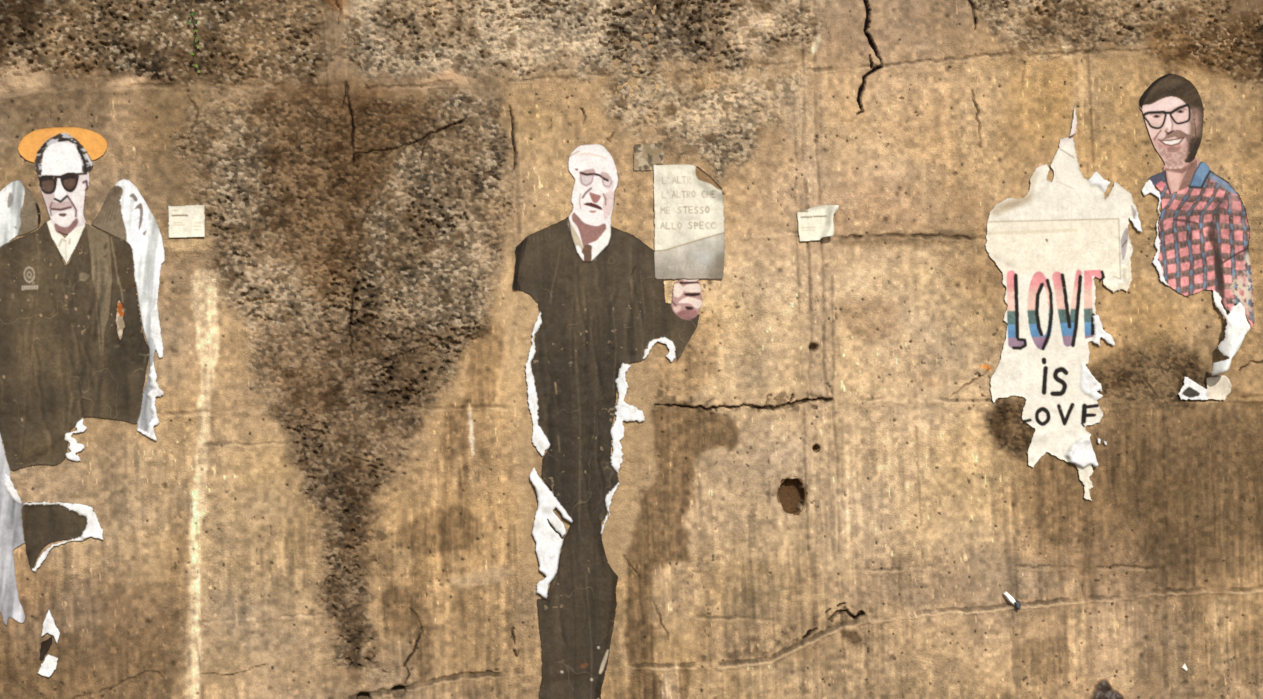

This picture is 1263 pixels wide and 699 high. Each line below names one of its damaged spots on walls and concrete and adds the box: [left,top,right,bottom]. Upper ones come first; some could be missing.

crack [856,0,884,116]
damp [338,315,513,695]
damp [615,298,750,699]
damp [1021,379,1263,699]